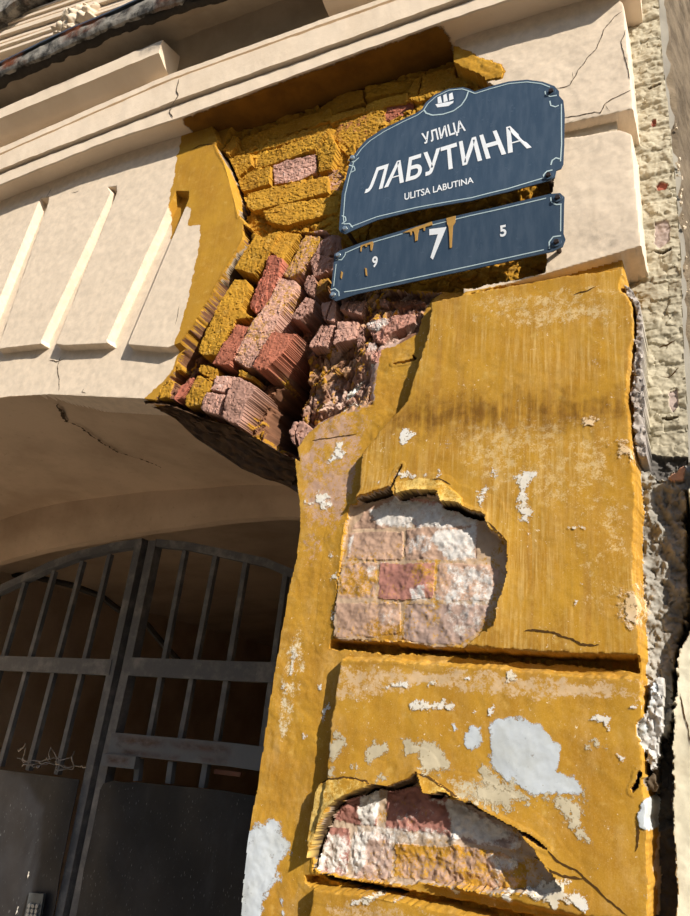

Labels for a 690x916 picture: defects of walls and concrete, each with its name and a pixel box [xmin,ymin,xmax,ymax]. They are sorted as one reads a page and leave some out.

crack [560,12,662,117]
spalling [144,51,555,488]
crack [53,403,161,468]
spalling [329,467,508,652]
crack [525,629,599,646]
peeling [409,698,455,712]
crack [680,695,690,741]
peeling [241,818,293,916]
crack [311,773,477,892]
spalling [318,704,591,913]
crack [503,821,627,916]